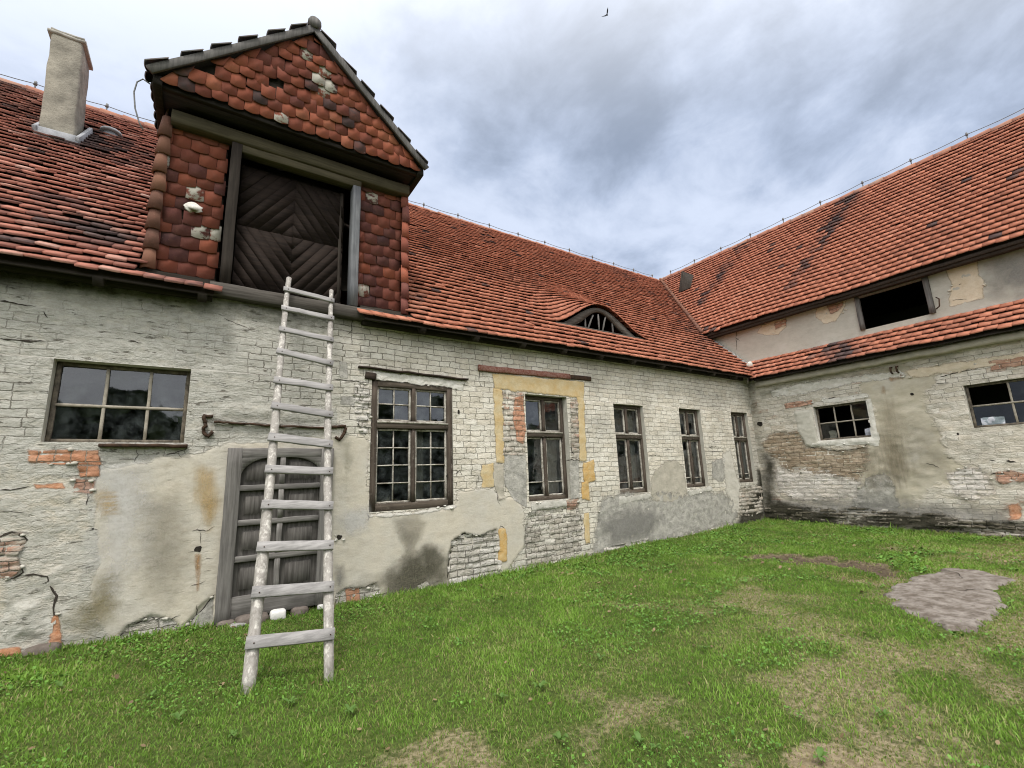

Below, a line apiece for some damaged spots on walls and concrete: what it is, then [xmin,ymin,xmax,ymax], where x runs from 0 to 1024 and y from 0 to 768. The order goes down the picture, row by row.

peeling [946,262,986,306]
flaking render [502,391,526,455]
flaking render [28,447,101,493]
flaking render [738,431,1024,539]
leakage [607,512,655,539]
leakage [774,503,994,519]
spalling [0,532,26,580]
crack [0,486,58,616]
leakage [388,551,446,596]
spalling [416,529,502,591]